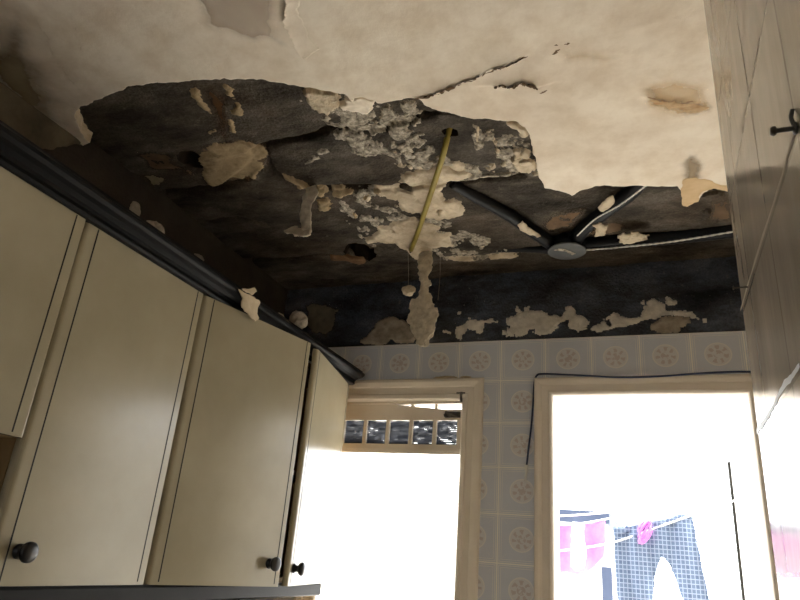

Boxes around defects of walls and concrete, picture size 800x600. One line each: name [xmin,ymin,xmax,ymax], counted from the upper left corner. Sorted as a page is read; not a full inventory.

peeling [203,0,269,35]
peeling [282,0,320,59]
crack [415,56,547,99]
damp [648,97,708,113]
spalling [79,78,745,347]